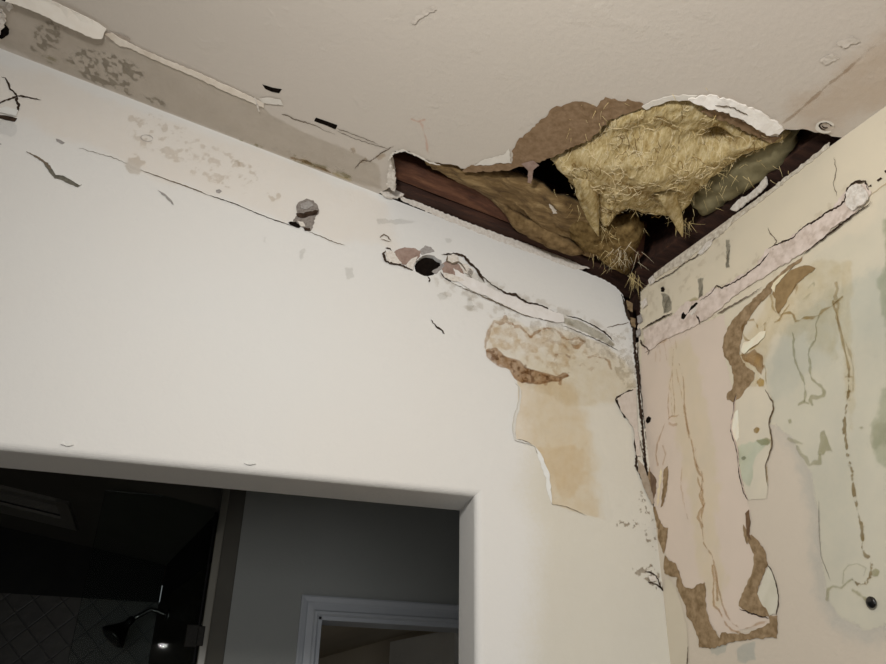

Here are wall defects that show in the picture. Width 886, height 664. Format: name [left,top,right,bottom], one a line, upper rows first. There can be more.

crack [0,77,39,111]
crack [26,151,81,187]
peeling [0,0,264,108]
flaking render [289,198,319,231]
spalling [380,234,484,282]
flaking render [380,149,590,270]
flaking render [642,94,784,143]
crack [448,159,870,506]
peeling [639,106,886,637]
leakage [512,377,586,516]